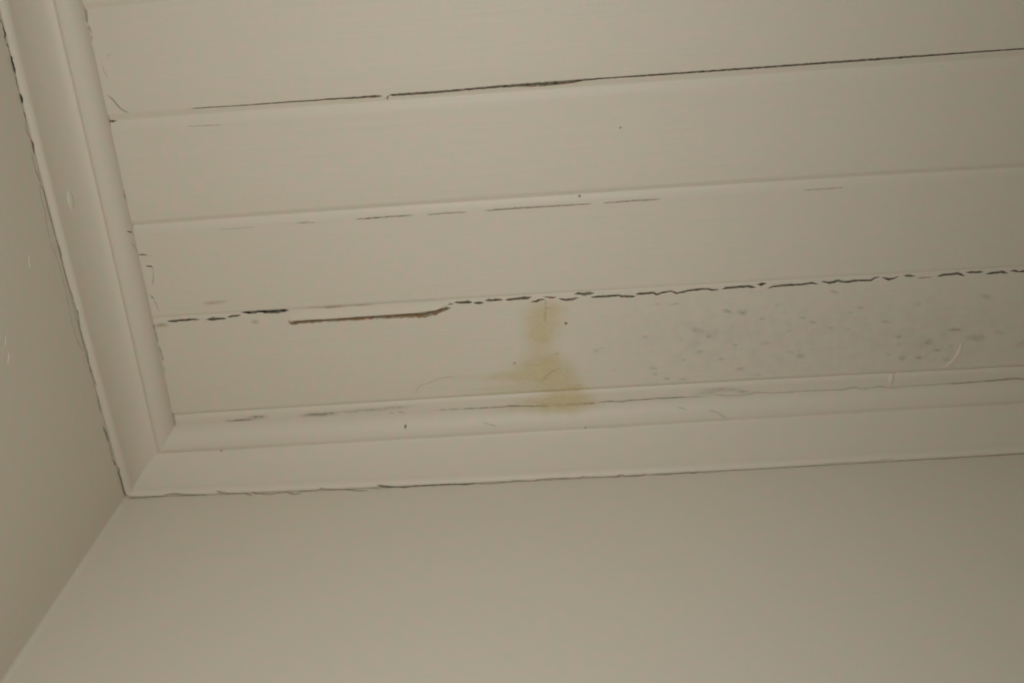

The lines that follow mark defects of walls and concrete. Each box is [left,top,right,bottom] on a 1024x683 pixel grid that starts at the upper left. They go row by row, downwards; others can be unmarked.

crack [193,48,1024,109]
crack [937,269,1024,277]
crack [153,275,912,359]
crack [320,483,475,491]